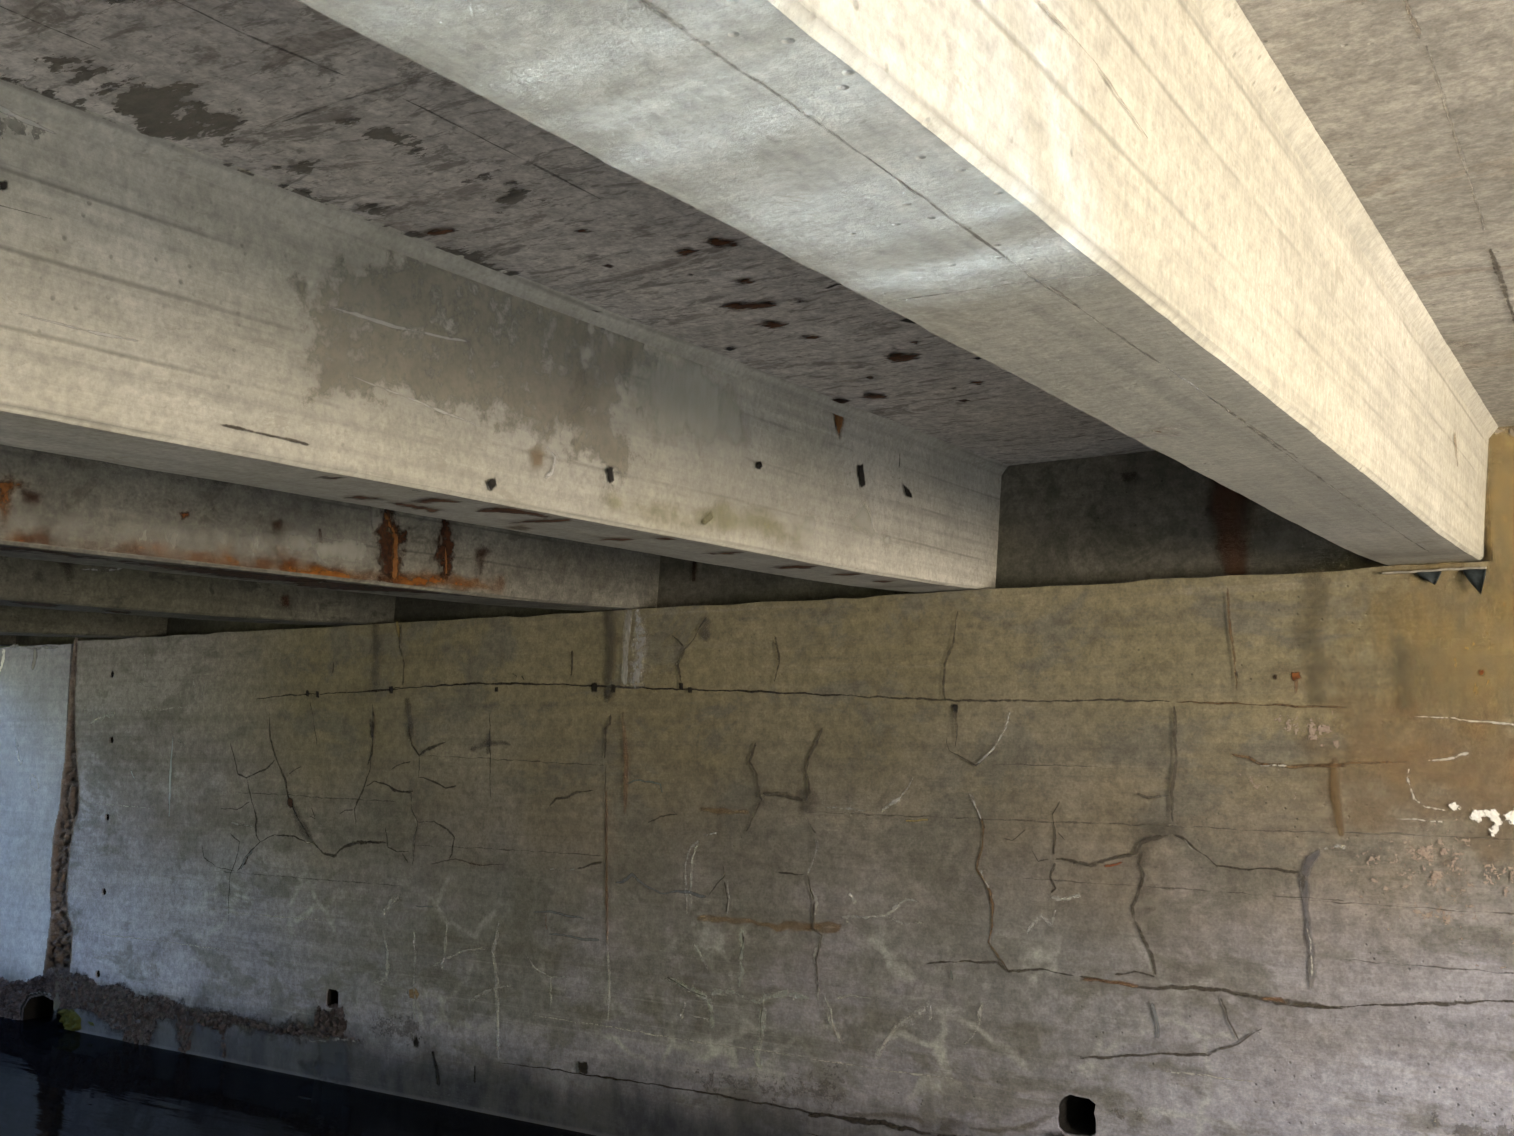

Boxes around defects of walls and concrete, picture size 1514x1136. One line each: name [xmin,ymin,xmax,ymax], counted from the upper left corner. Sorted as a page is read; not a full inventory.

rust [676,238,739,257]
rust [720,301,788,329]
rust [886,318,922,363]
rust [0,480,501,597]
rust [1209,479,1249,575]
spalling [43,637,80,978]
crack [202,627,508,905]
crack [578,861,728,912]
crack [746,728,822,833]
crack [779,872,823,992]
crack [928,611,1514,1060]
peeling [1347,819,1514,966]